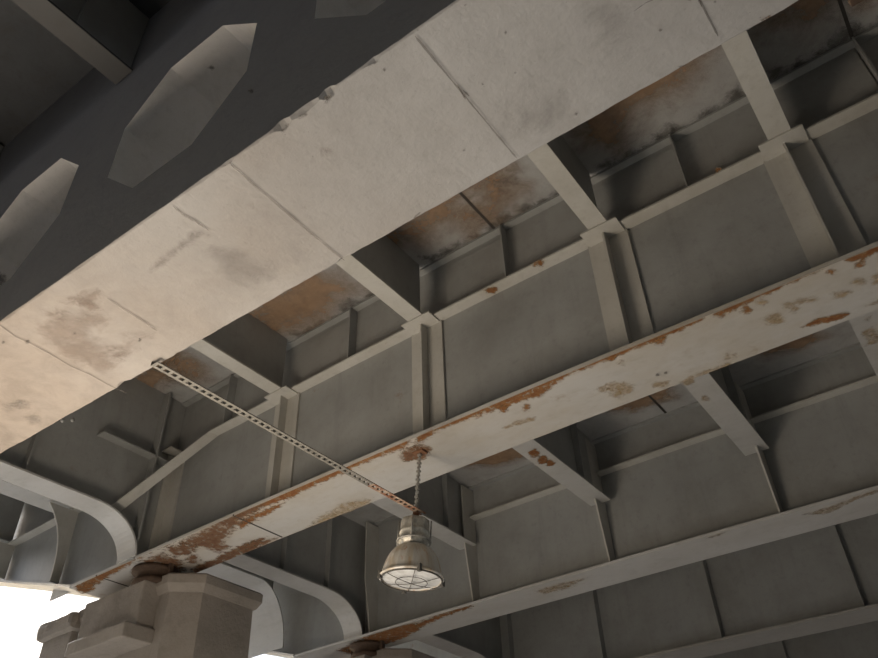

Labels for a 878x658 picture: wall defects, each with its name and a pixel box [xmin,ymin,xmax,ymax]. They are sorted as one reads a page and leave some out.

corrosion [580,60,695,148]
corrosion [844,247,878,268]
corrosion [763,313,849,356]
corrosion [75,270,836,594]
corrosion [338,605,474,654]